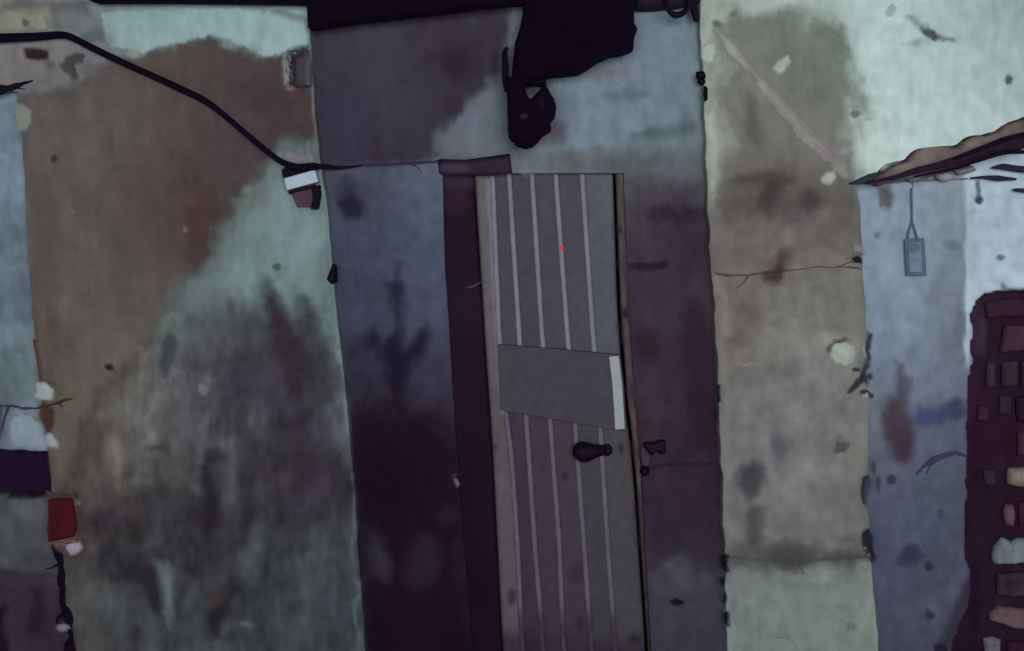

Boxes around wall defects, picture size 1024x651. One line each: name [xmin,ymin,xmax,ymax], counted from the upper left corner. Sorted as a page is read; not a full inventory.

flaking render [773,55,790,74]
water stain [22,8,508,508]
crack [715,261,861,288]
corrosion [884,380,912,458]
crack [915,450,967,474]
water stain [114,563,173,628]